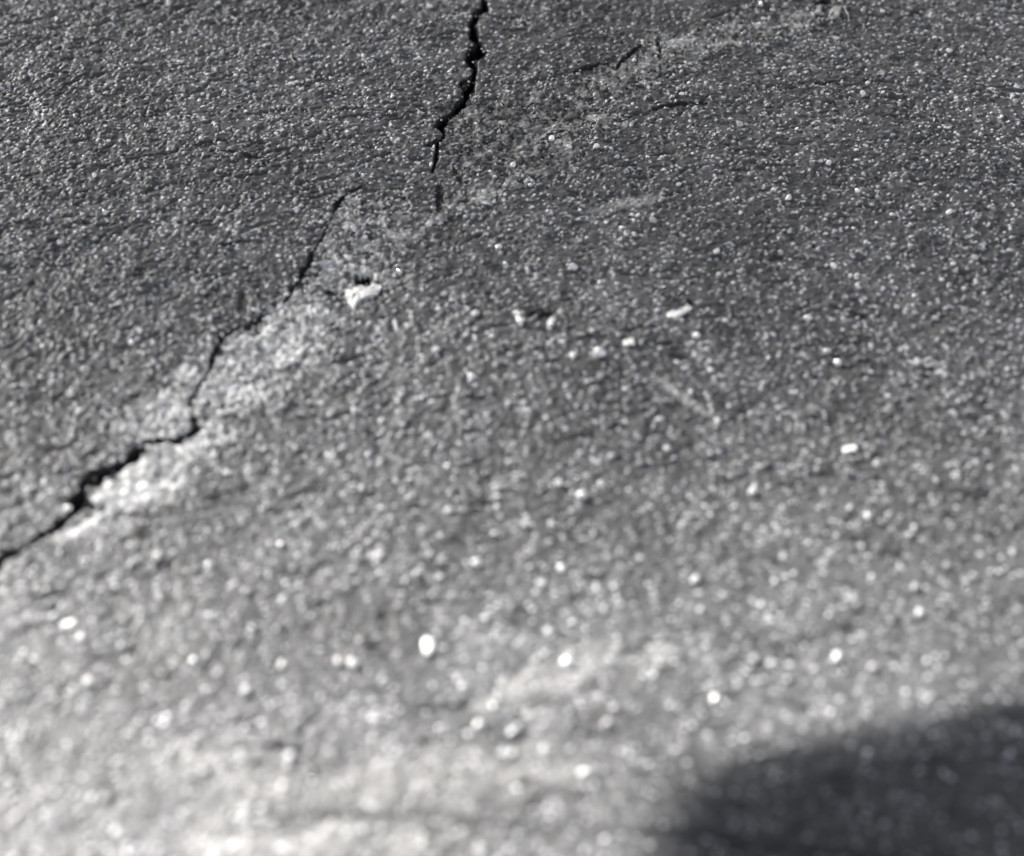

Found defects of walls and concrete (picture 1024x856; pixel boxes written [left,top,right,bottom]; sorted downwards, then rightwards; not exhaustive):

crack [218,149,267,159]
crack [426,0,489,213]
crack [0,182,368,569]